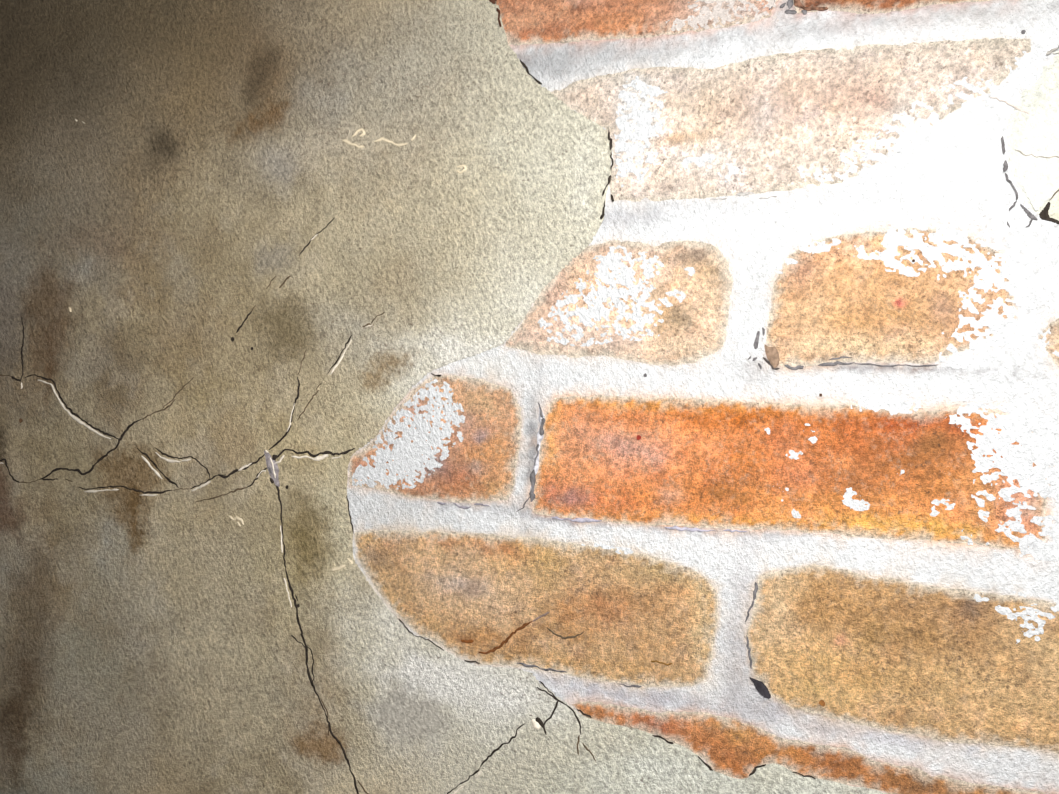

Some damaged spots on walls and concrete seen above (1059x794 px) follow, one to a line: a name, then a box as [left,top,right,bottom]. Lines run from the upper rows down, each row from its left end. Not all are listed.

crack [989,96,1029,115]
crack [1046,46,1059,55]
crack [1001,136,1059,227]
crack [236,218,334,333]
flaking render [347,0,1059,794]
crack [0,312,385,794]
crack [461,612,583,654]
crack [447,681,596,794]